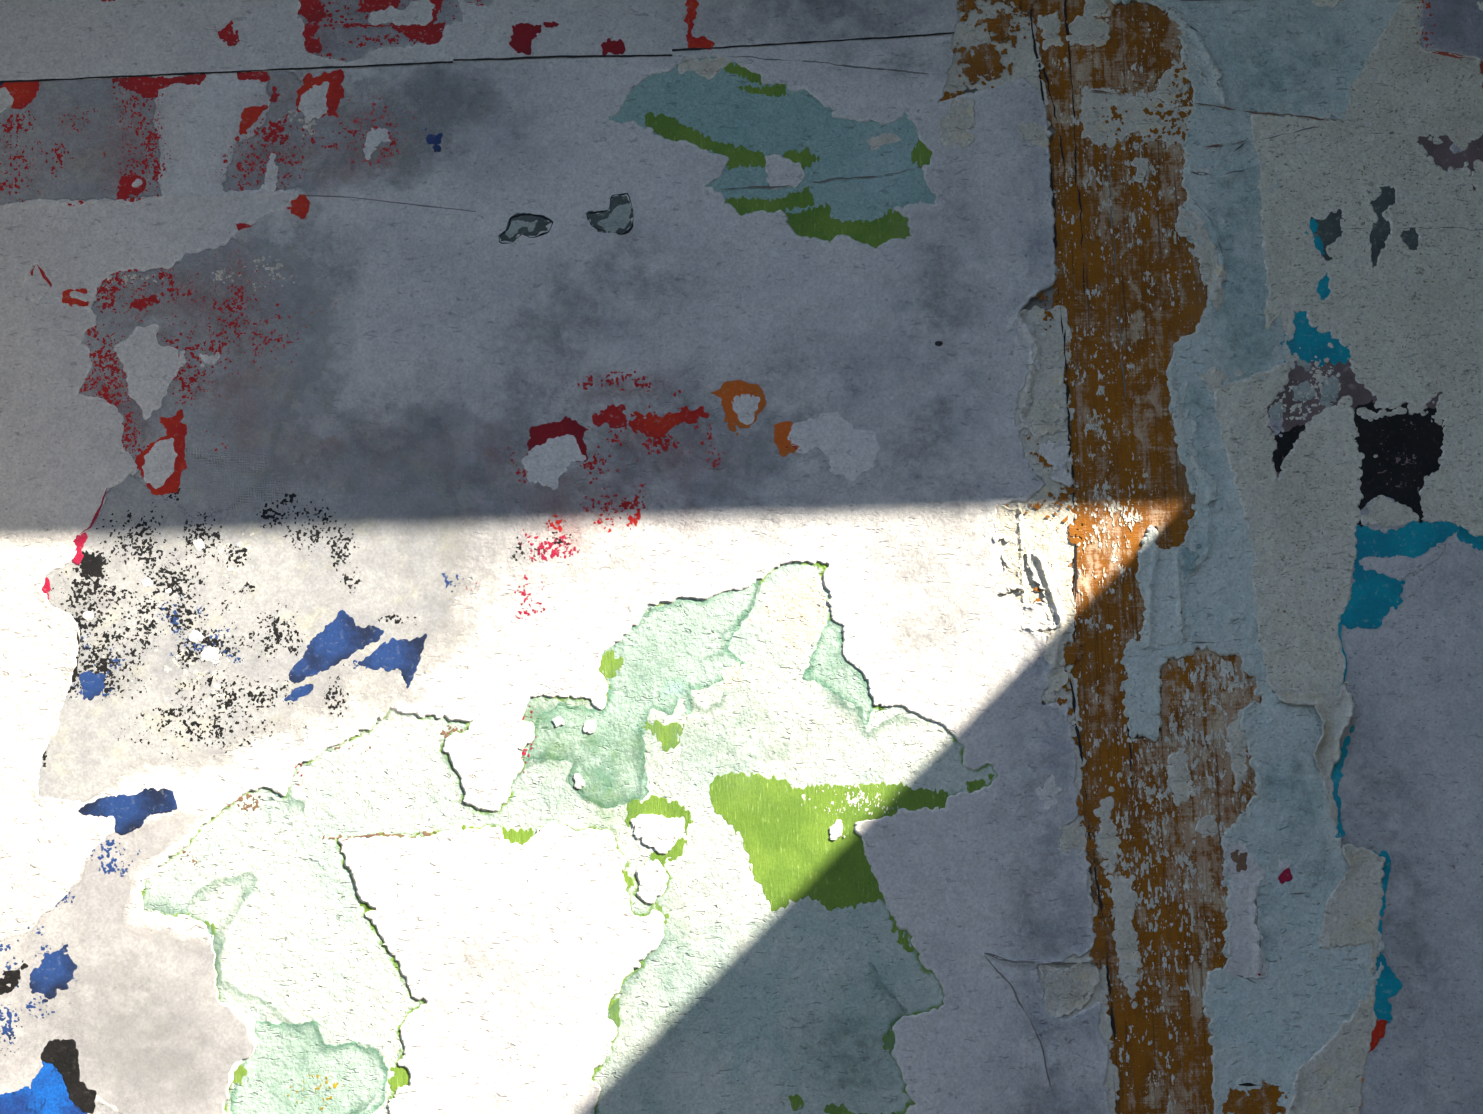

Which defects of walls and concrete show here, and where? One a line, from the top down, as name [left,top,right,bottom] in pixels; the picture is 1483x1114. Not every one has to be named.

peeling [509,21,559,55]
peeling [601,38,626,55]
peeling [684,0,715,50]
peeling [0,74,206,206]
peeling [214,0,494,227]
peeling [507,369,880,533]
peeling [508,515,580,625]
peeling [0,223,477,1114]
peeling [1331,725,1355,838]
peeling [1230,849,1248,872]
peeling [1278,868,1293,884]
peeling [1369,849,1403,1052]